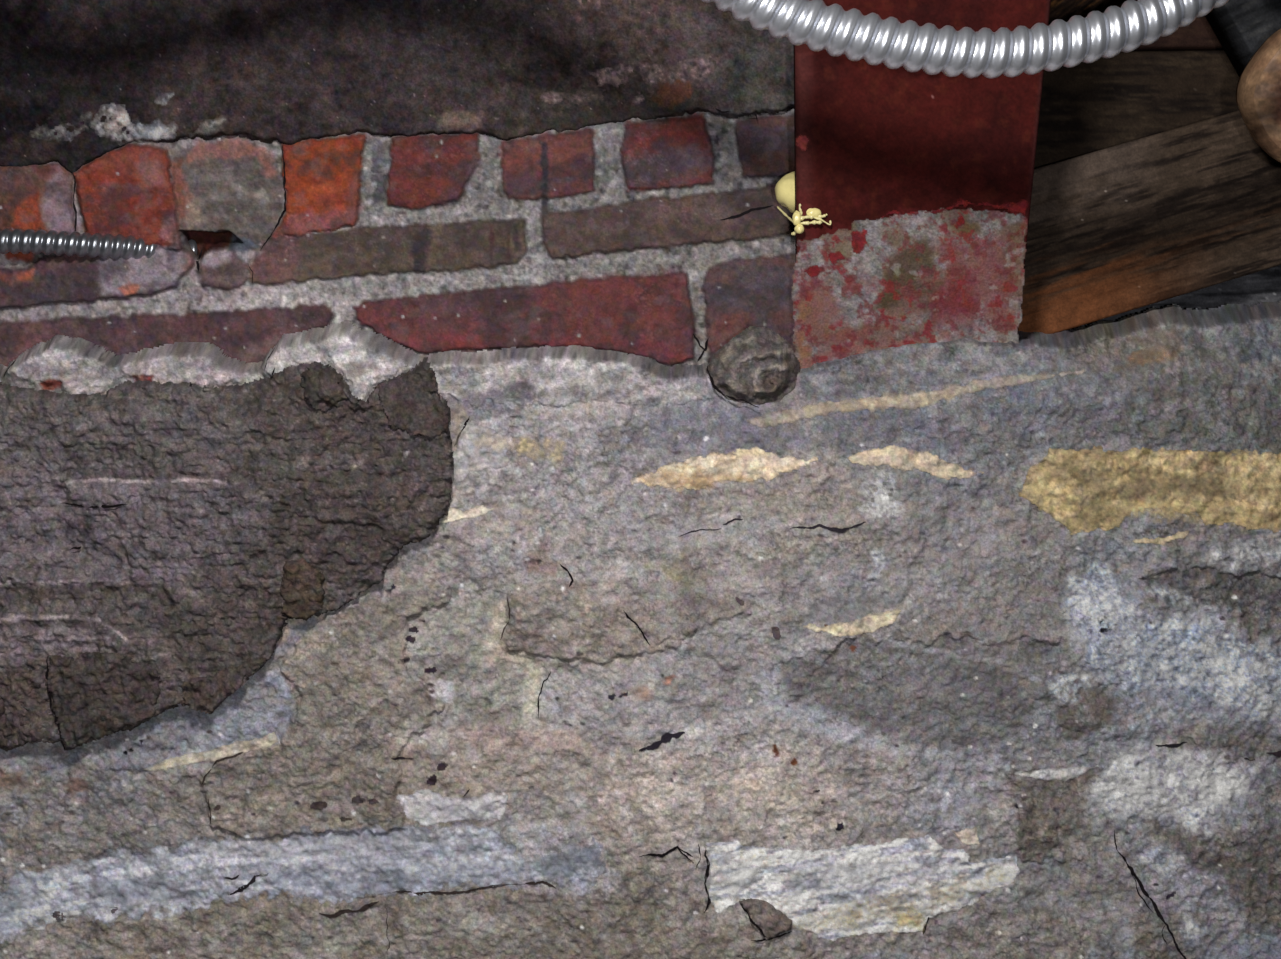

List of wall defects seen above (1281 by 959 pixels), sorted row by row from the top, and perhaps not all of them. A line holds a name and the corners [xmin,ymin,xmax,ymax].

peeling [791,199,1028,369]
crack [1114,830,1186,959]